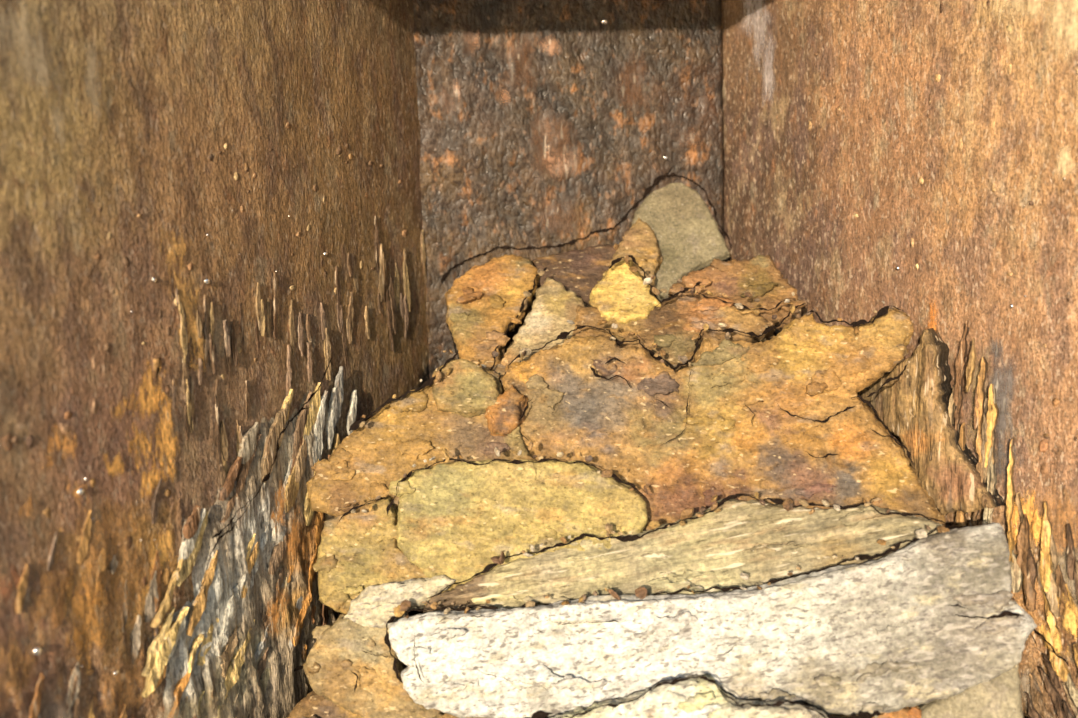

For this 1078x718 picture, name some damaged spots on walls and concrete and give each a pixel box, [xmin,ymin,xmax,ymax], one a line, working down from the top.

corrosion [535,120,575,176]
corrosion [234,162,257,213]
corrosion [0,216,411,718]
peeling [311,448,356,481]
corrosion [1011,485,1078,553]
peeling [312,624,332,640]
peeling [324,585,364,611]
corrosion [1024,591,1077,653]